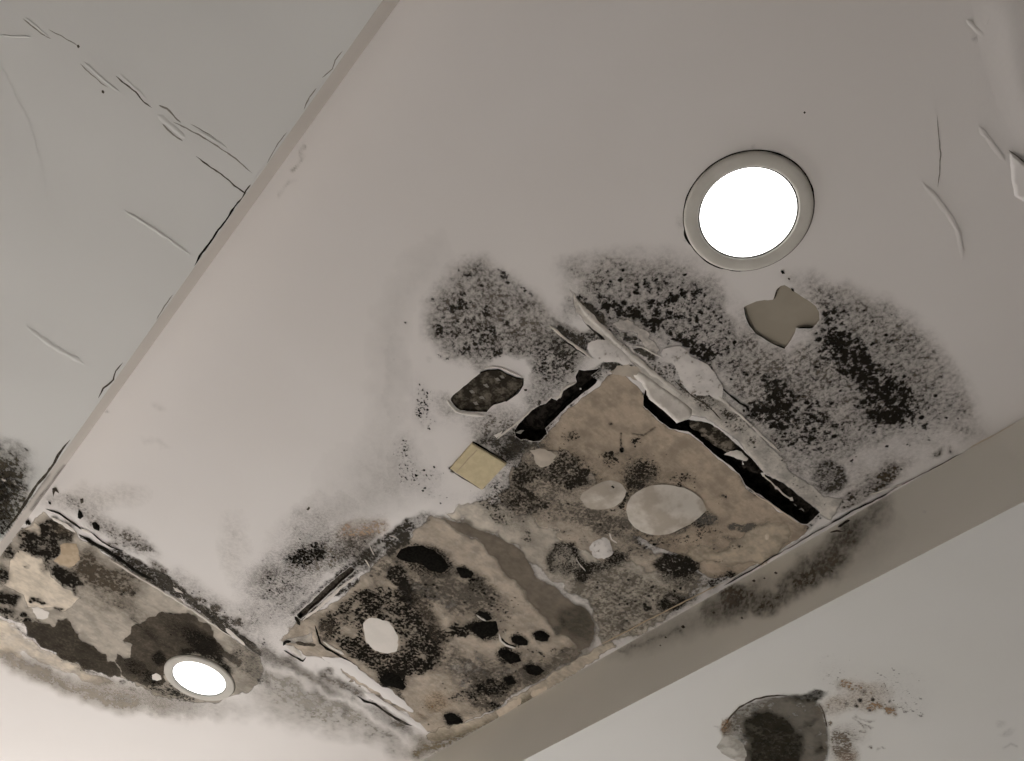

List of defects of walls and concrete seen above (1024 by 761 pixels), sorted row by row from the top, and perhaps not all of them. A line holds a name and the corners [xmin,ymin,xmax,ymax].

crack [1,17,285,266]
crack [304,52,342,109]
water stain [684,150,814,209]
crack [921,118,964,263]
crack [27,327,84,364]
crack [98,364,122,398]
mould [431,263,583,404]
mould [571,258,970,511]
peeling [744,271,820,349]
flaking render [0,512,263,704]
water stain [0,412,873,761]
flaking render [282,319,809,733]